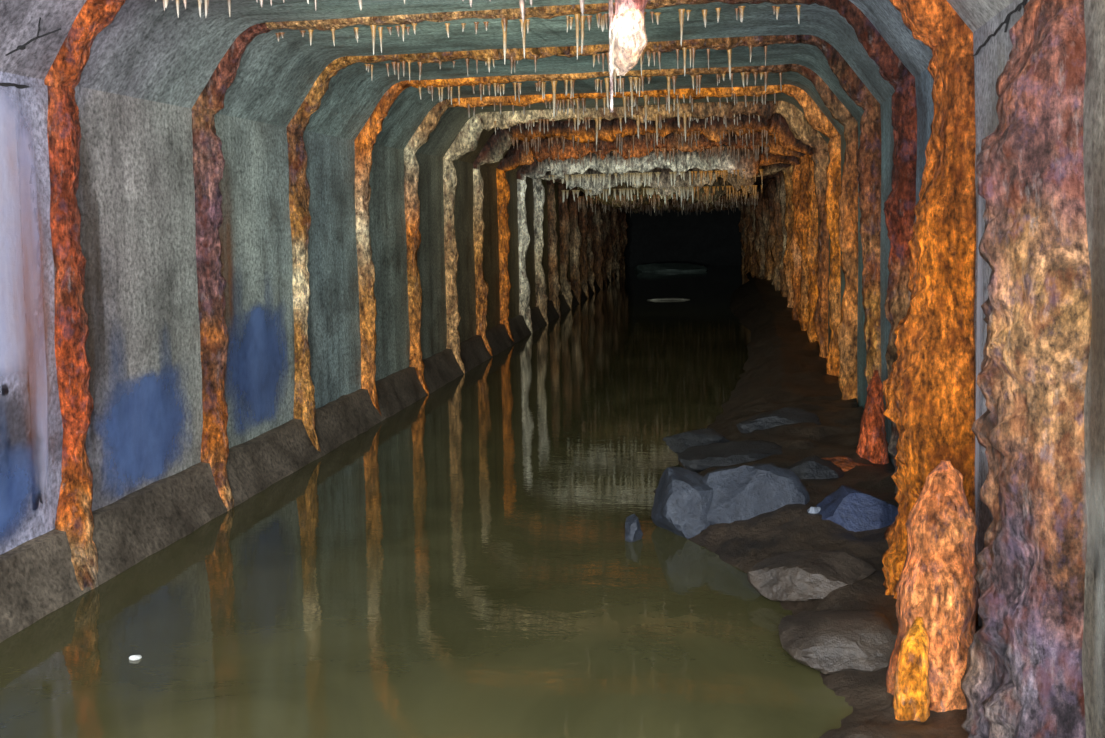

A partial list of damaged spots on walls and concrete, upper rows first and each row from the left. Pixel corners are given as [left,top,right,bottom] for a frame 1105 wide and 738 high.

crack [0,82,29,90]
crack [6,18,61,56]
rust [155,0,209,18]
crack [973,0,1027,56]
water stain [0,90,48,536]
rust [44,0,126,590]
water stain [228,307,287,427]
rust [192,0,881,511]
rust [645,0,1092,738]
water stain [101,374,185,489]